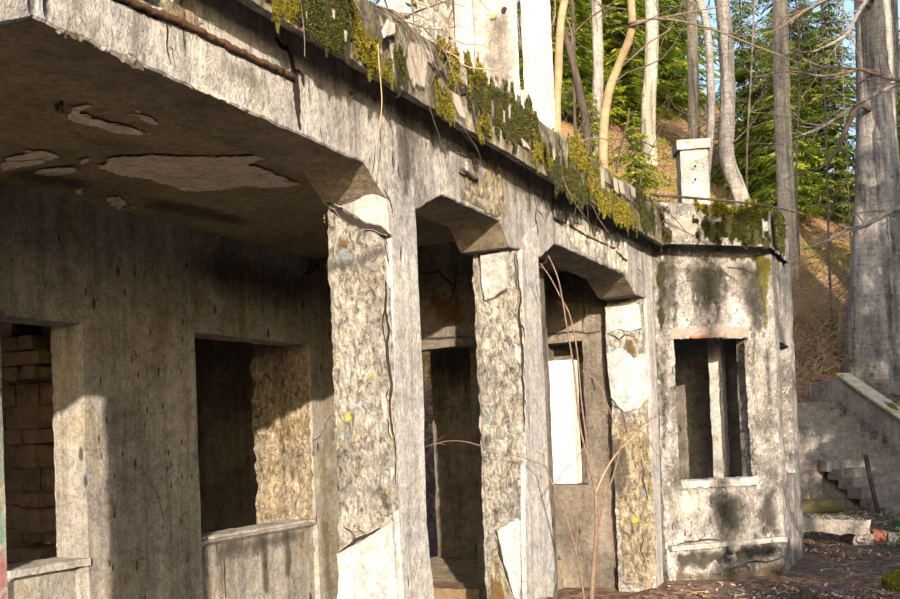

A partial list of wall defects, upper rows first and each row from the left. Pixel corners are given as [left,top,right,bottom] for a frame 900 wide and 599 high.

rust [112,0,295,79]
peeling [61,105,158,136]
peeling [0,150,298,192]
crack [325,145,397,484]
spalling [328,214,399,549]